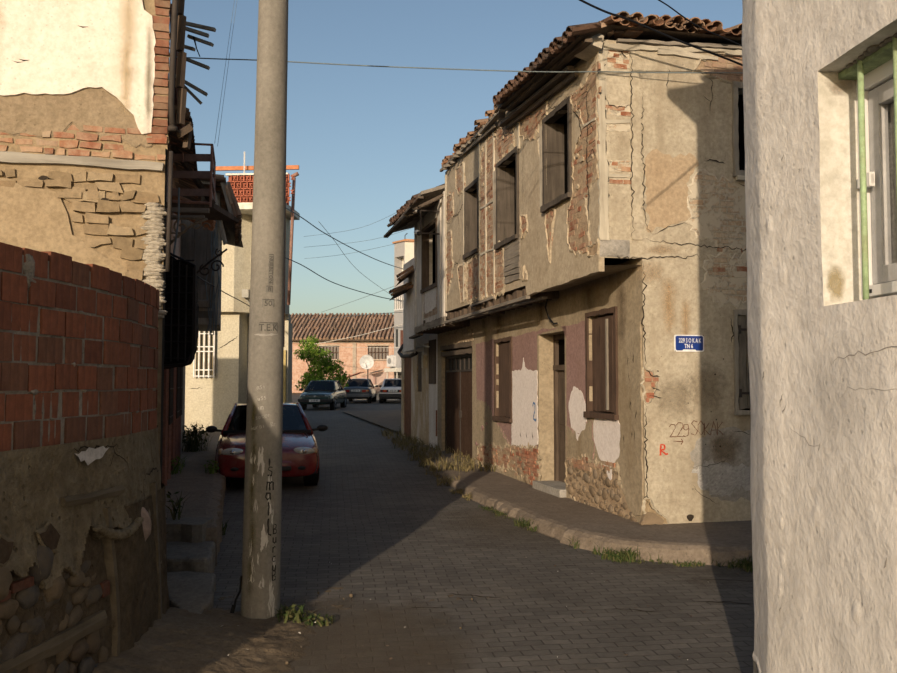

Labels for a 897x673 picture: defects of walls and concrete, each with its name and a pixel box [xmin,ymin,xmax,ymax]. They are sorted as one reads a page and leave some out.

flaking render [692,52,743,84]
spalling [0,121,154,149]
flaking render [566,50,632,258]
flaking render [424,100,550,319]
flaking render [544,207,556,263]
flaking render [686,169,747,309]
crack [568,44,746,512]
crack [830,346,897,367]
flaking render [476,439,541,485]